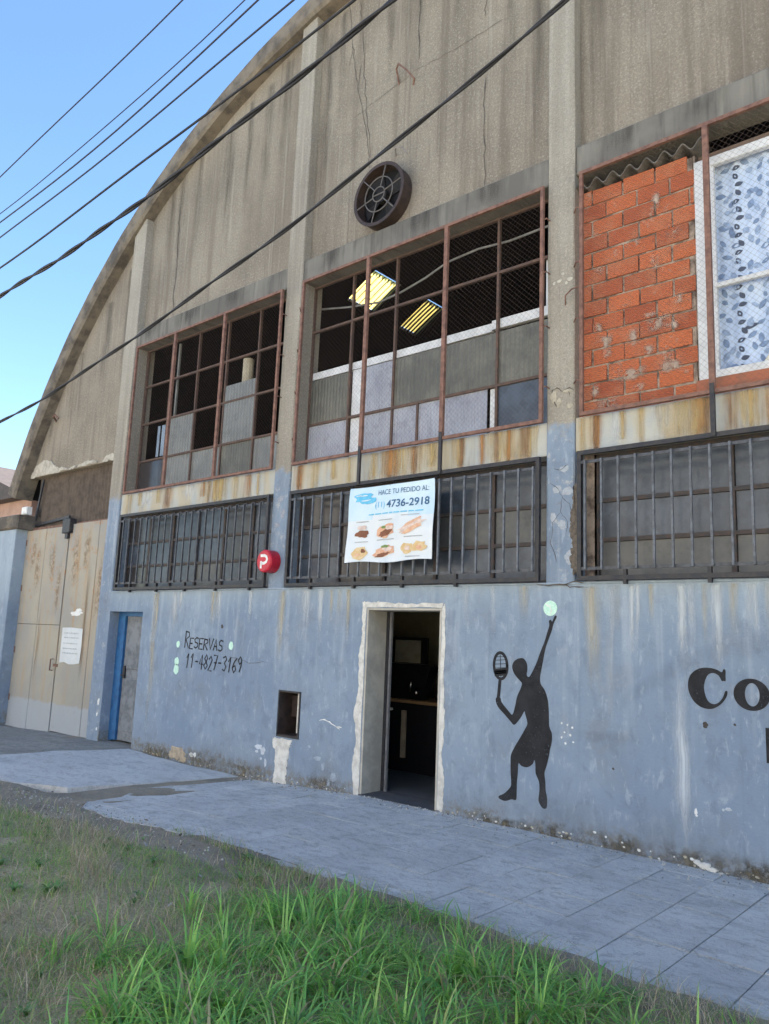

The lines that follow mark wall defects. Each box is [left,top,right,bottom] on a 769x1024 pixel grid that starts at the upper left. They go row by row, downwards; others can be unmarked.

crack [348,0,503,168]
rust [480,427,531,464]
rust [581,415,600,448]
rust [675,396,710,434]
flaking render [31,453,114,479]
spalling [550,484,577,575]
peeling [232,601,769,906]
water stain [599,838,638,855]
water stain [666,852,700,868]
water stain [734,864,769,883]